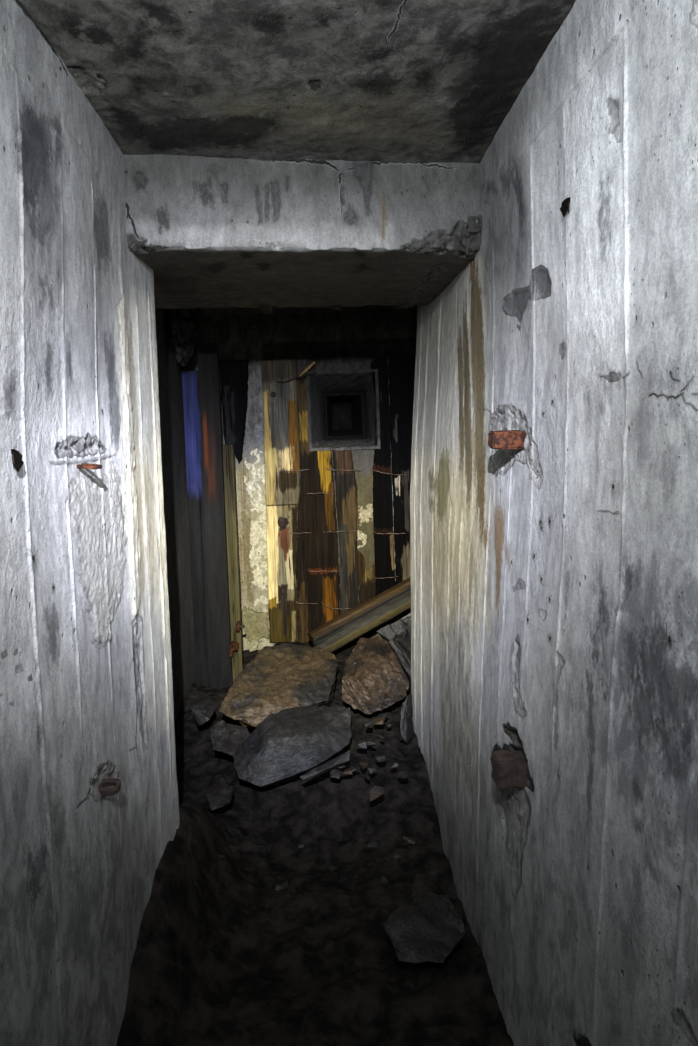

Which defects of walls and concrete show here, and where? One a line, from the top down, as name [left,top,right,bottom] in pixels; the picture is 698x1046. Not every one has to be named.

crack [369,0,408,55]
leakage [111,108,280,150]
crack [125,199,141,241]
leakage [256,177,289,225]
spalling [400,216,483,261]
peeling [502,265,551,331]
crack [599,361,698,412]
spalling [54,433,106,459]
spalling [488,403,543,489]
flaking render [241,408,269,652]
spalling [90,761,122,801]
spalling [490,634,535,899]